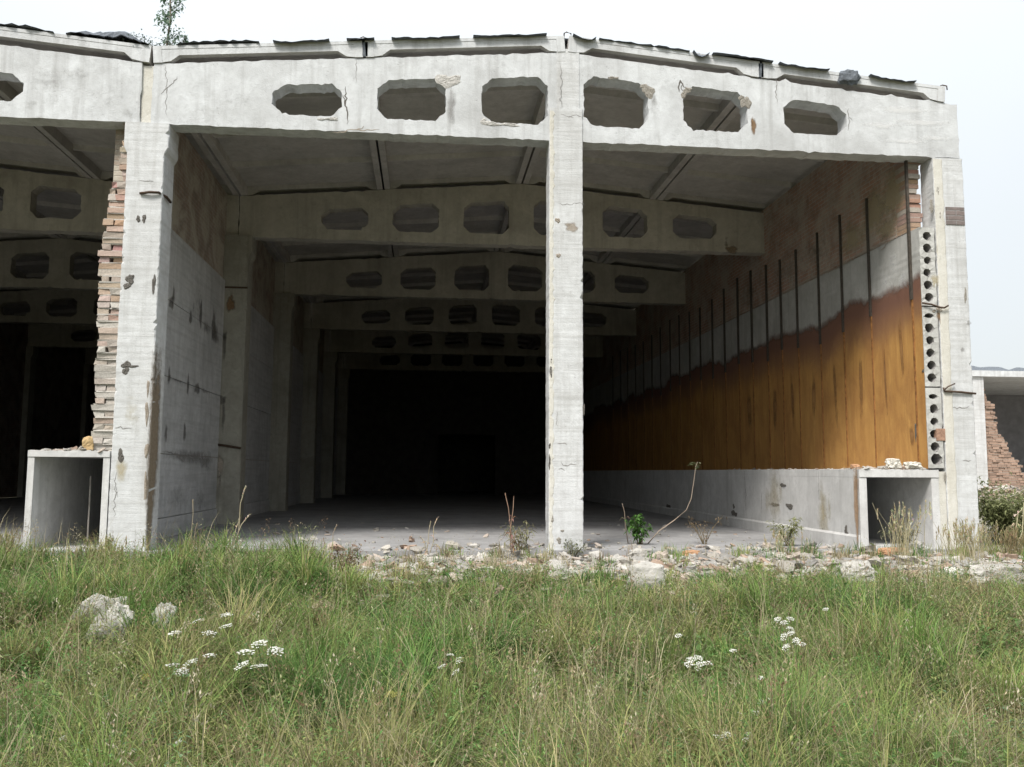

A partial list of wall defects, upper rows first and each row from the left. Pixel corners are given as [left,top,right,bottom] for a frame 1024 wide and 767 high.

spalling [435,74,461,88]
crack [332,64,379,133]
spalling [640,84,655,99]
spalling [738,95,752,109]
spalling [480,118,519,127]
spalling [123,274,134,289]
damp [189,303,226,354]
spalling [121,360,138,375]
damp [146,365,170,549]